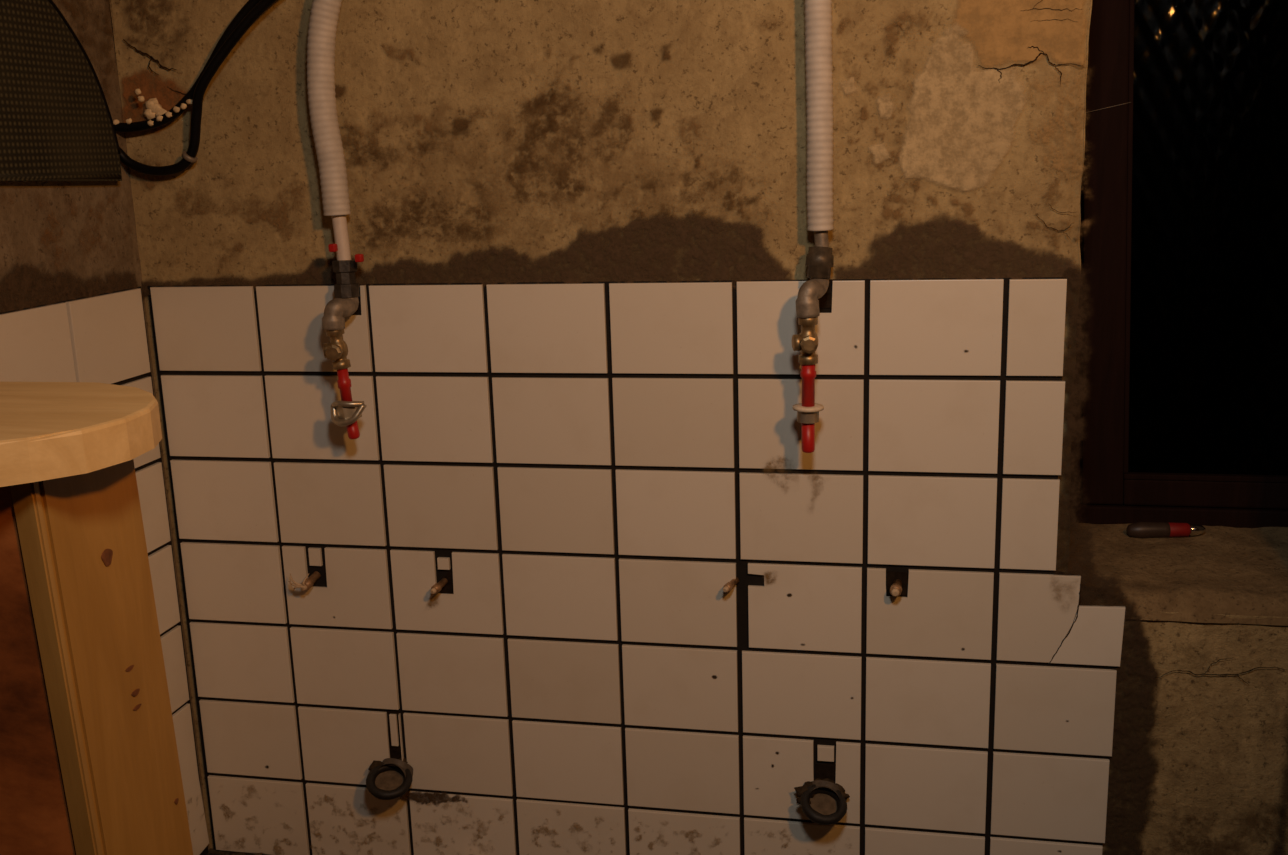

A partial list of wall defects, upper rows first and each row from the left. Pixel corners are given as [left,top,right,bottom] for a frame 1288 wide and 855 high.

crack [978,0,1081,85]
leakage [342,111,482,167]
leakage [507,80,632,199]
crack [1050,584,1081,662]